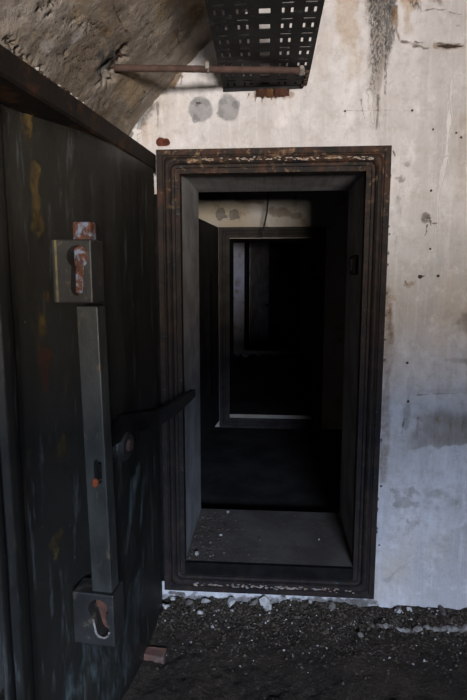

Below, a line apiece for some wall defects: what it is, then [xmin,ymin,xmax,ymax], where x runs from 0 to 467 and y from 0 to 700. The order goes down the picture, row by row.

leakage [369,0,419,85]